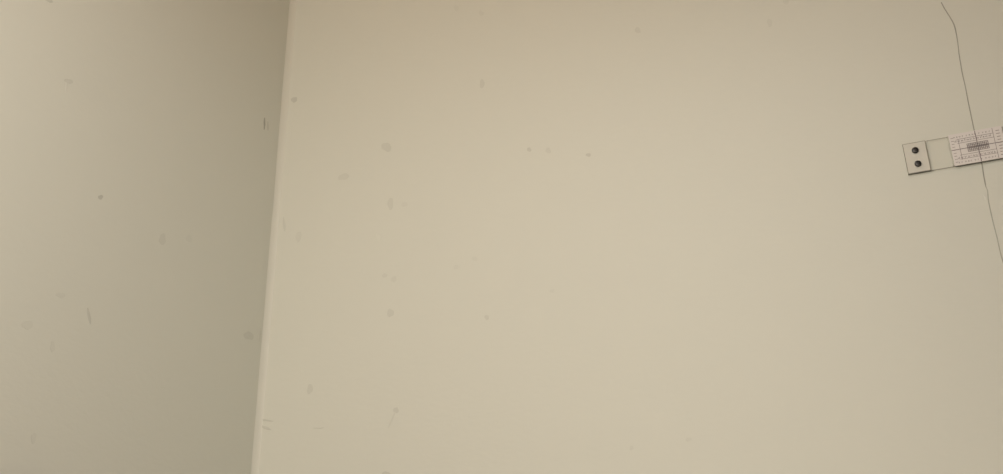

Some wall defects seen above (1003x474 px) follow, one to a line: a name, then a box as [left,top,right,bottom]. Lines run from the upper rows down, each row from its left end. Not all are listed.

crack [941,2,975,130]
crack [981,162,1003,262]